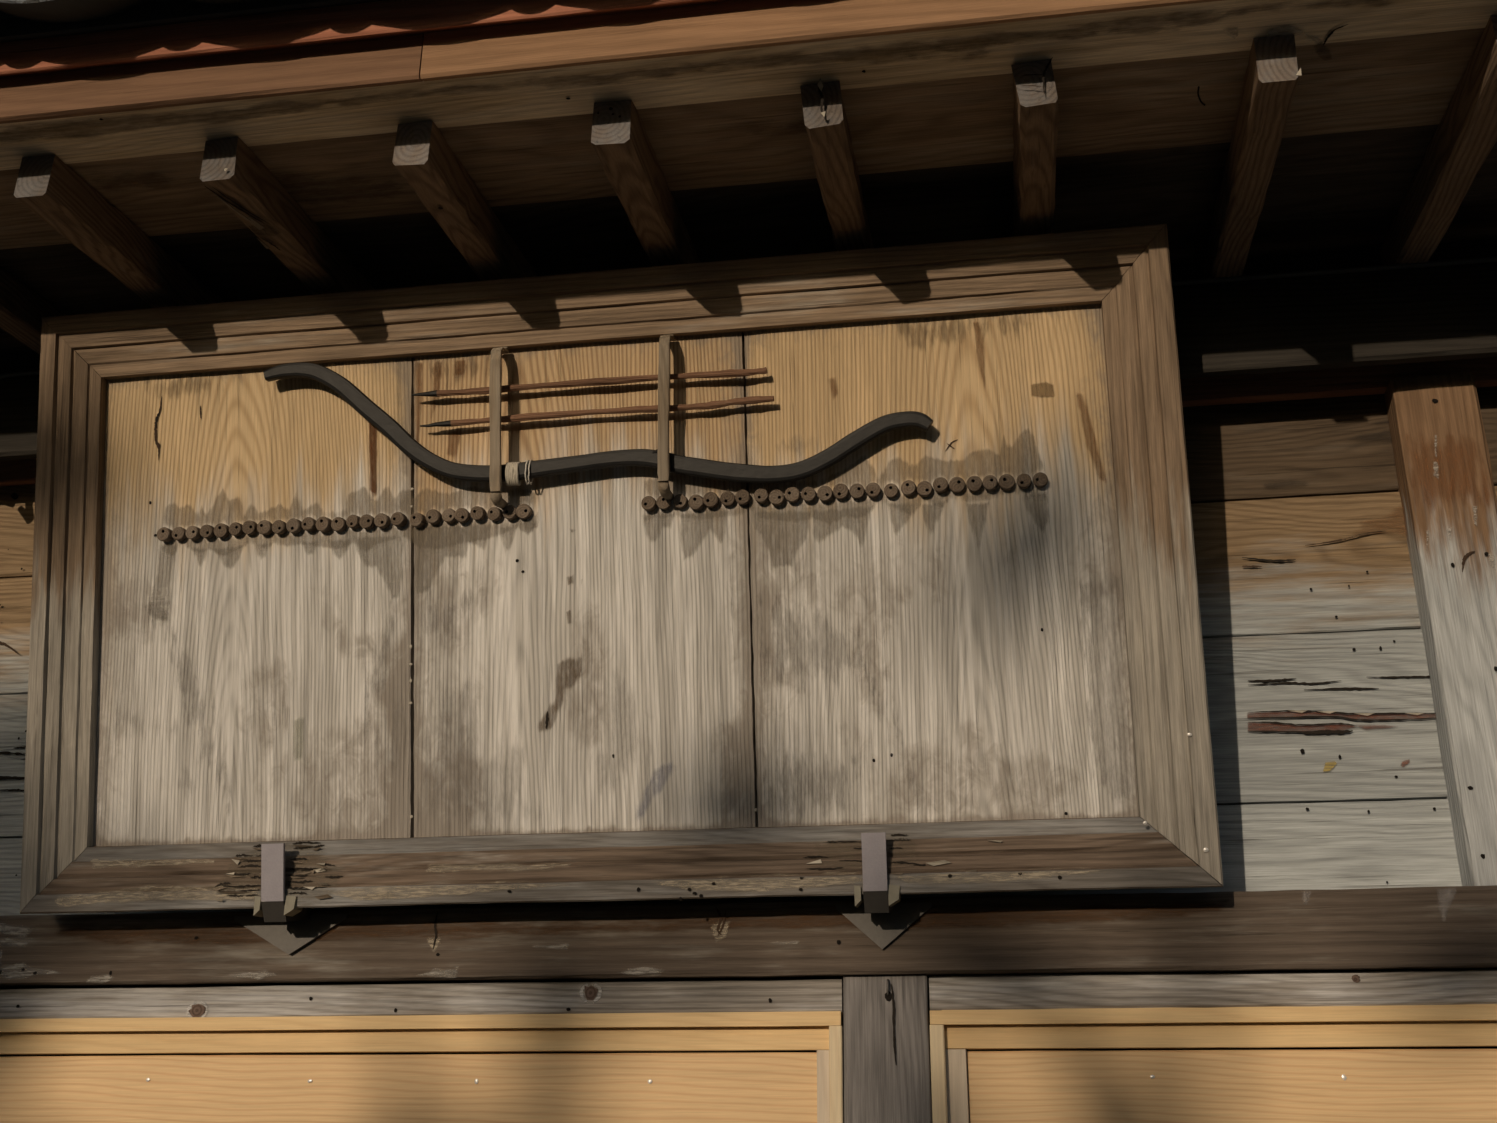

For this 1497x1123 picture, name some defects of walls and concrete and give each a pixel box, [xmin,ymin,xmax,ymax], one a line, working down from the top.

crack [154,396,162,461]
crack [1247,675,1436,734]
crack [0,746,26,792]
peeling [289,845,331,899]